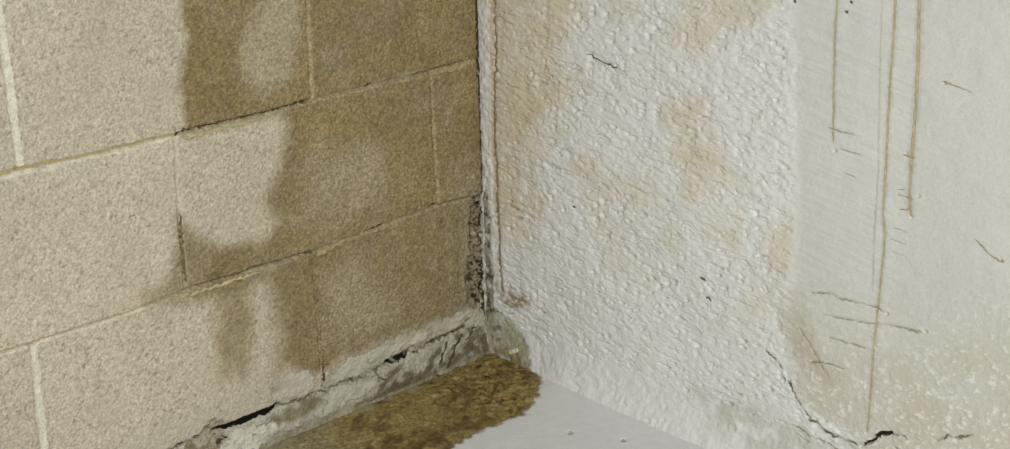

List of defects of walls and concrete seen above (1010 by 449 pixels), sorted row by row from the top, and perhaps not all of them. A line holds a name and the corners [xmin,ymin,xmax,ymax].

damp [182,0,482,371]
crack [174,0,503,438]
peeling [175,418,286,449]
damp [267,309,541,449]
crack [766,351,908,449]